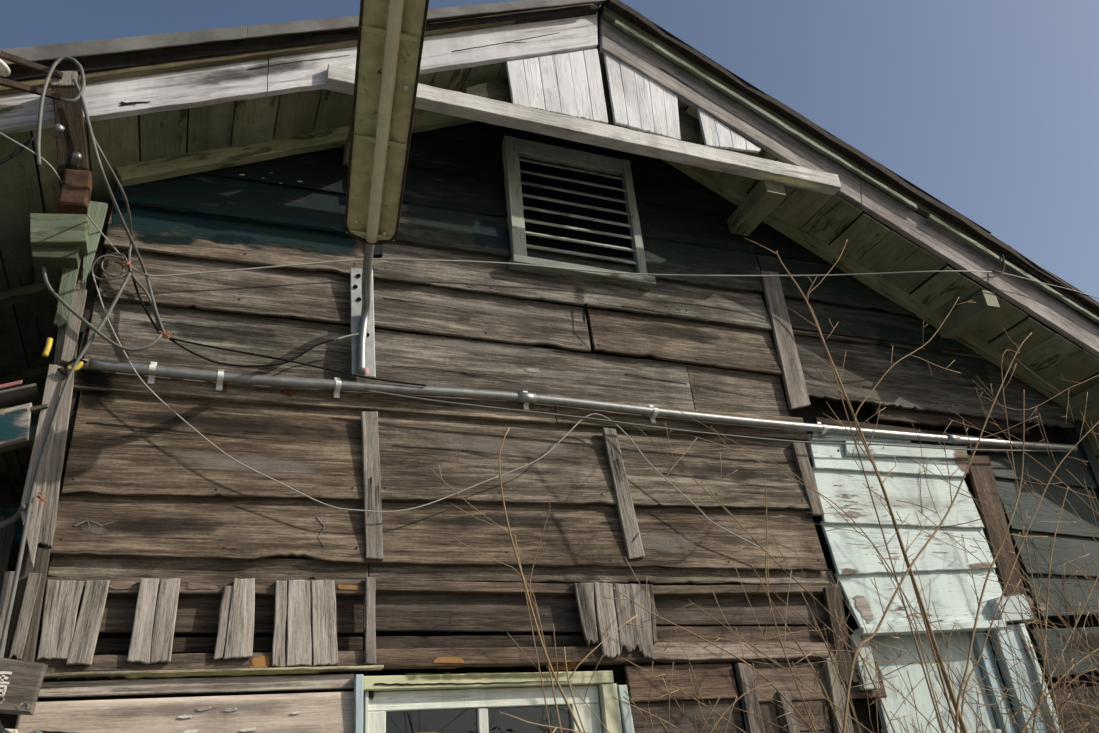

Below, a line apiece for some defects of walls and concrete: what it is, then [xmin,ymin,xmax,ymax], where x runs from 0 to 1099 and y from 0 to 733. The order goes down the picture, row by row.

peeling [0,410,29,440]
peeling [954,450,970,474]
peeling [853,595,874,622]